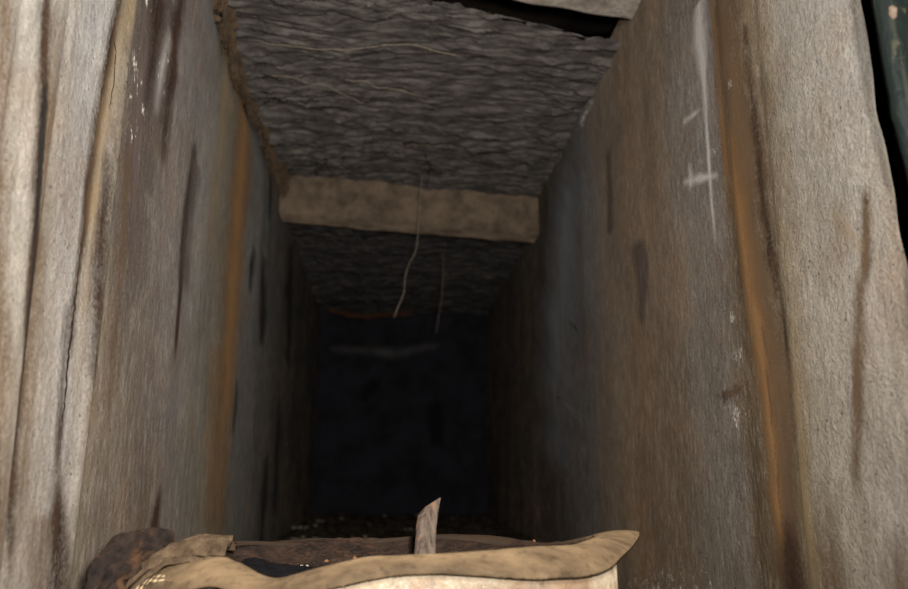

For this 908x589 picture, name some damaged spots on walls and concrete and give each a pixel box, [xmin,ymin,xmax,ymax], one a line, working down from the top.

water stain [0,0,54,548]
water stain [94,0,183,337]
water stain [853,194,871,479]
water stain [36,485,67,589]